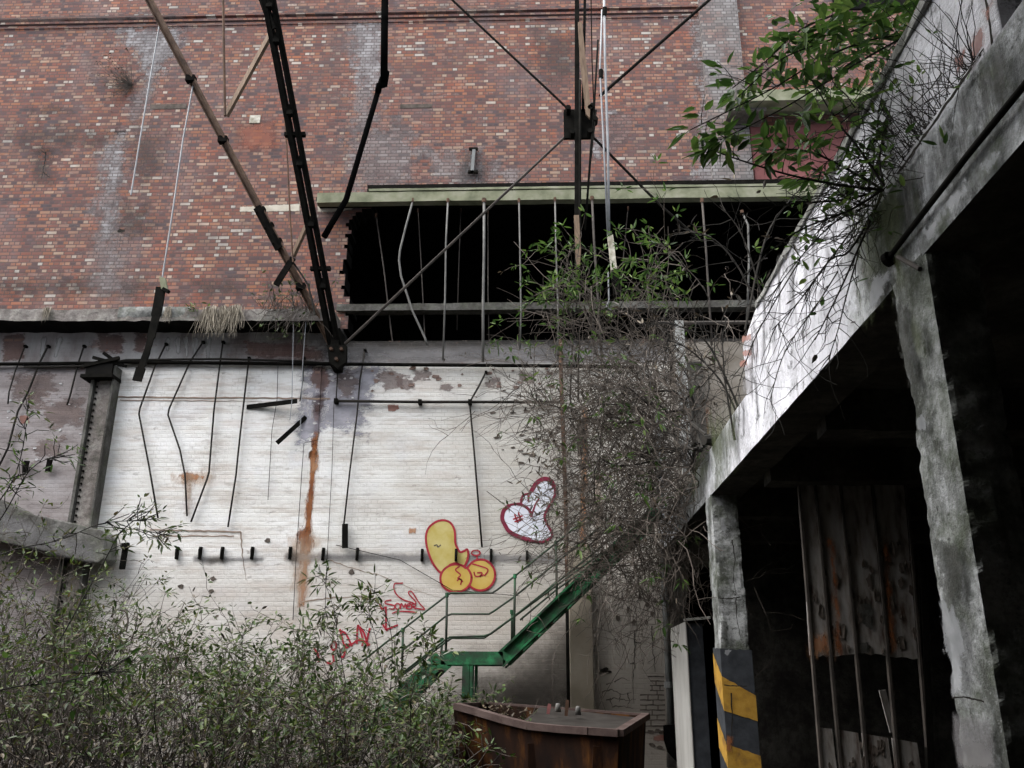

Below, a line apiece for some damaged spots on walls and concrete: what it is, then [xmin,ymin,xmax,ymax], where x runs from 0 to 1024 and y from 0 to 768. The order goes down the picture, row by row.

peeling [296,366,464,445]
peeling [484,368,554,414]
peeling [493,427,560,464]
corrosion [296,394,324,608]